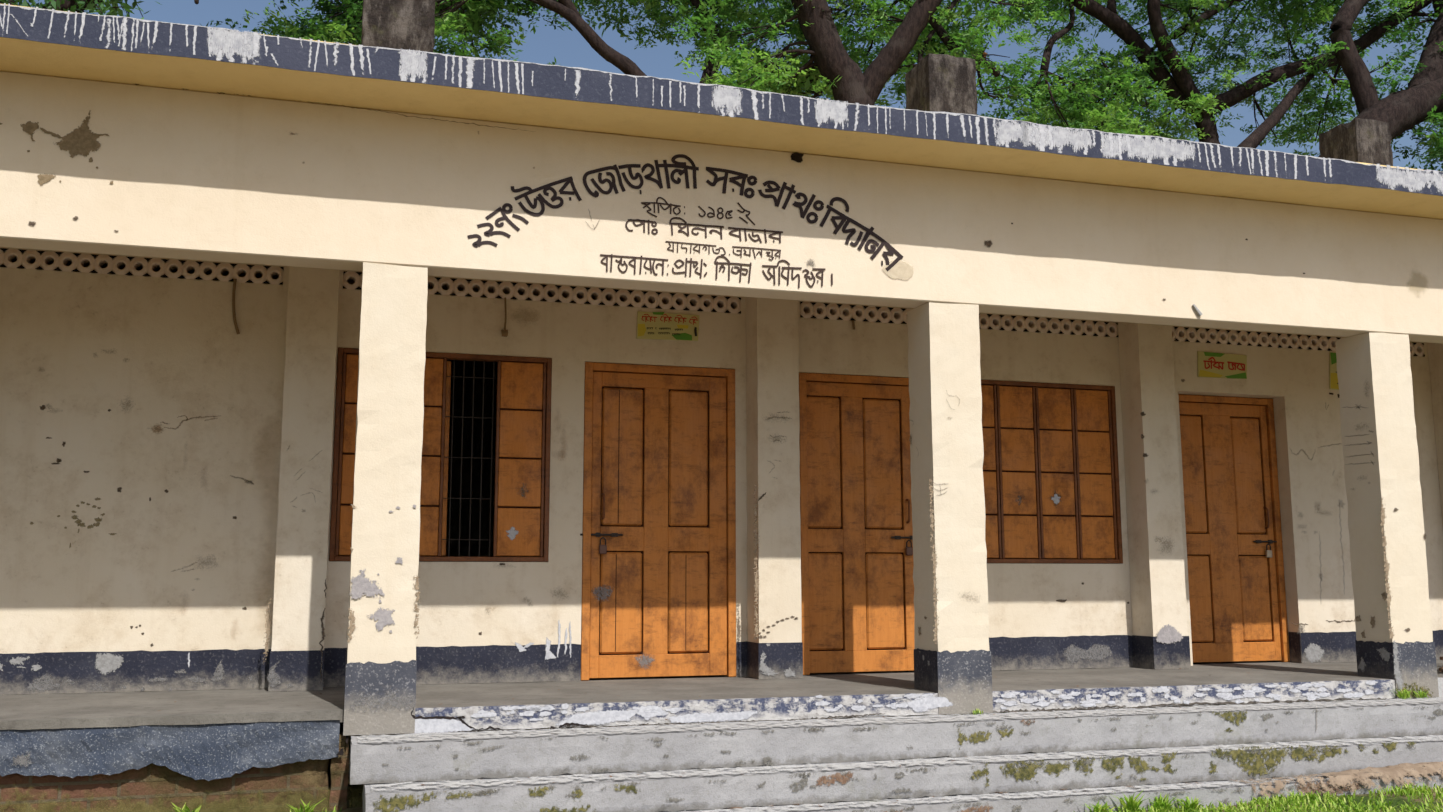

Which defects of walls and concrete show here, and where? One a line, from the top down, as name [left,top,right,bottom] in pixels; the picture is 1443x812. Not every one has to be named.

damp [2,3,38,36]
damp [64,11,188,51]
damp [207,27,278,65]
damp [308,39,379,76]
damp [399,48,534,94]
damp [661,81,742,117]
damp [807,97,1278,177]
damp [1376,165,1443,194]
peeling [347,569,395,642]
peeling [357,479,1443,743]
peeling [0,656,75,692]
peeling [92,652,225,691]